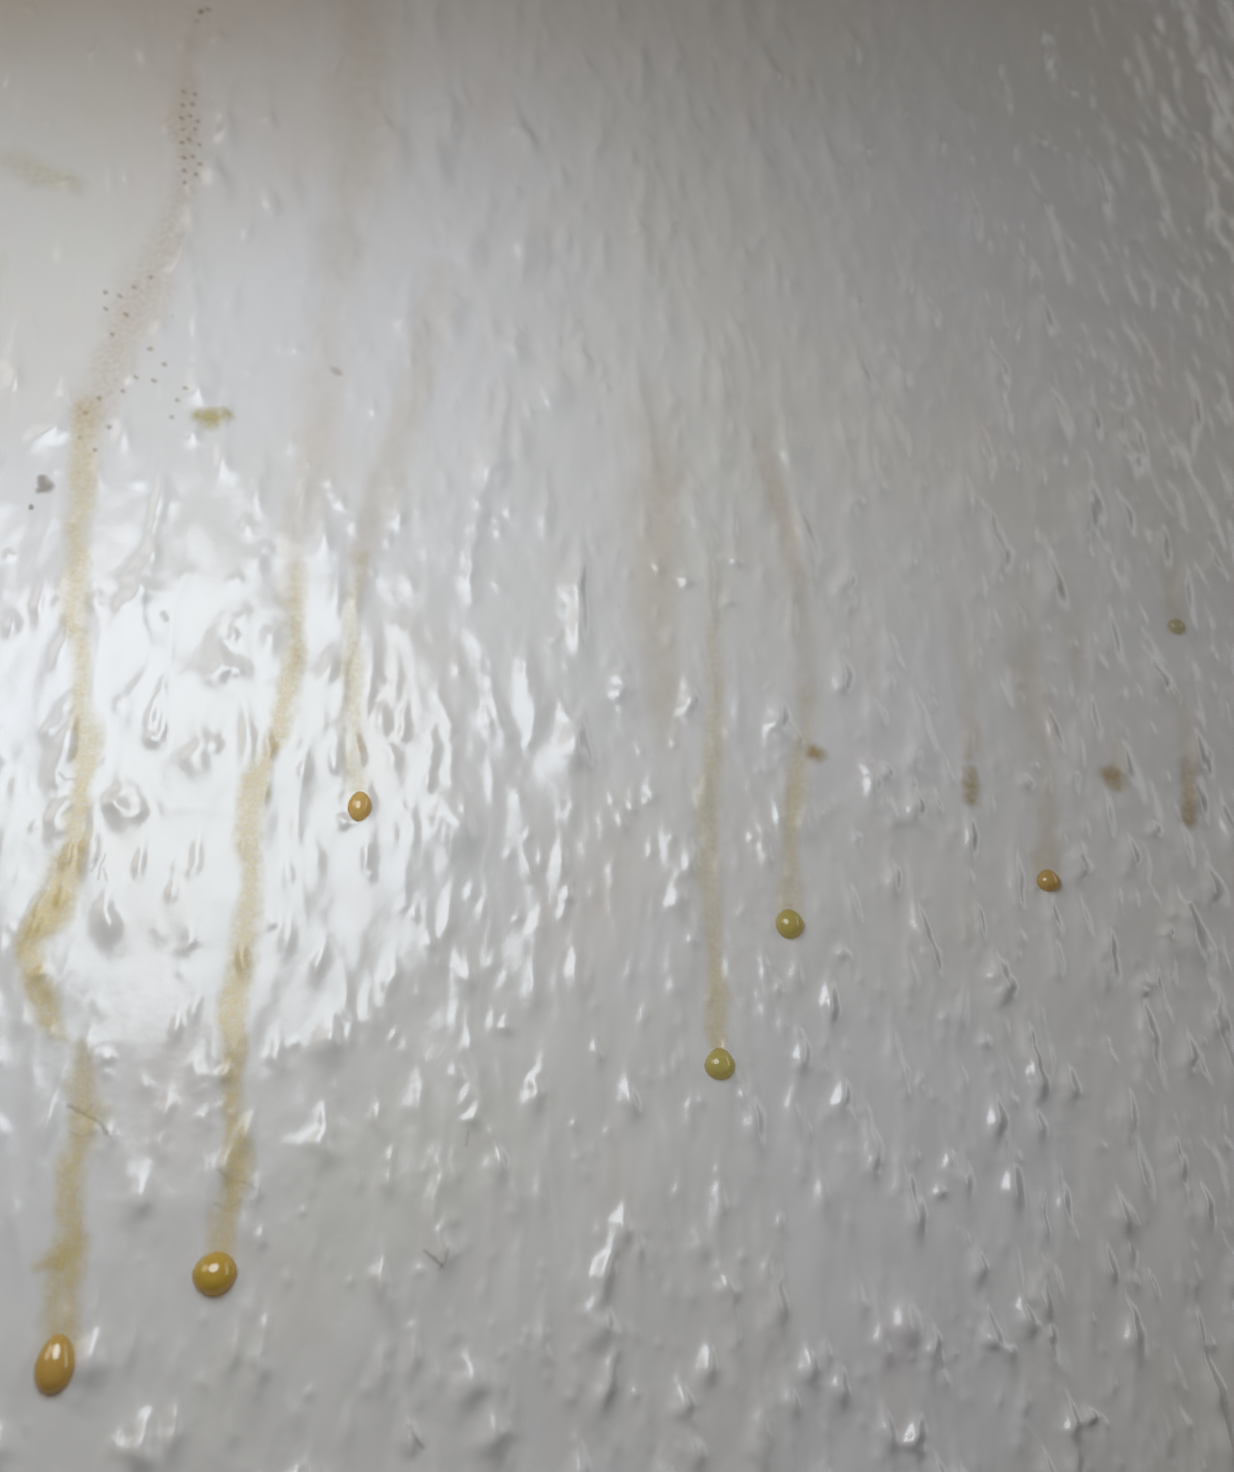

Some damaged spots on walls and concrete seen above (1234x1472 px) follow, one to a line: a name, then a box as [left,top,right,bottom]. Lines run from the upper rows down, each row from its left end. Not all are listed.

leakage [20,776,86,1025]
leakage [34,1324,75,1394]